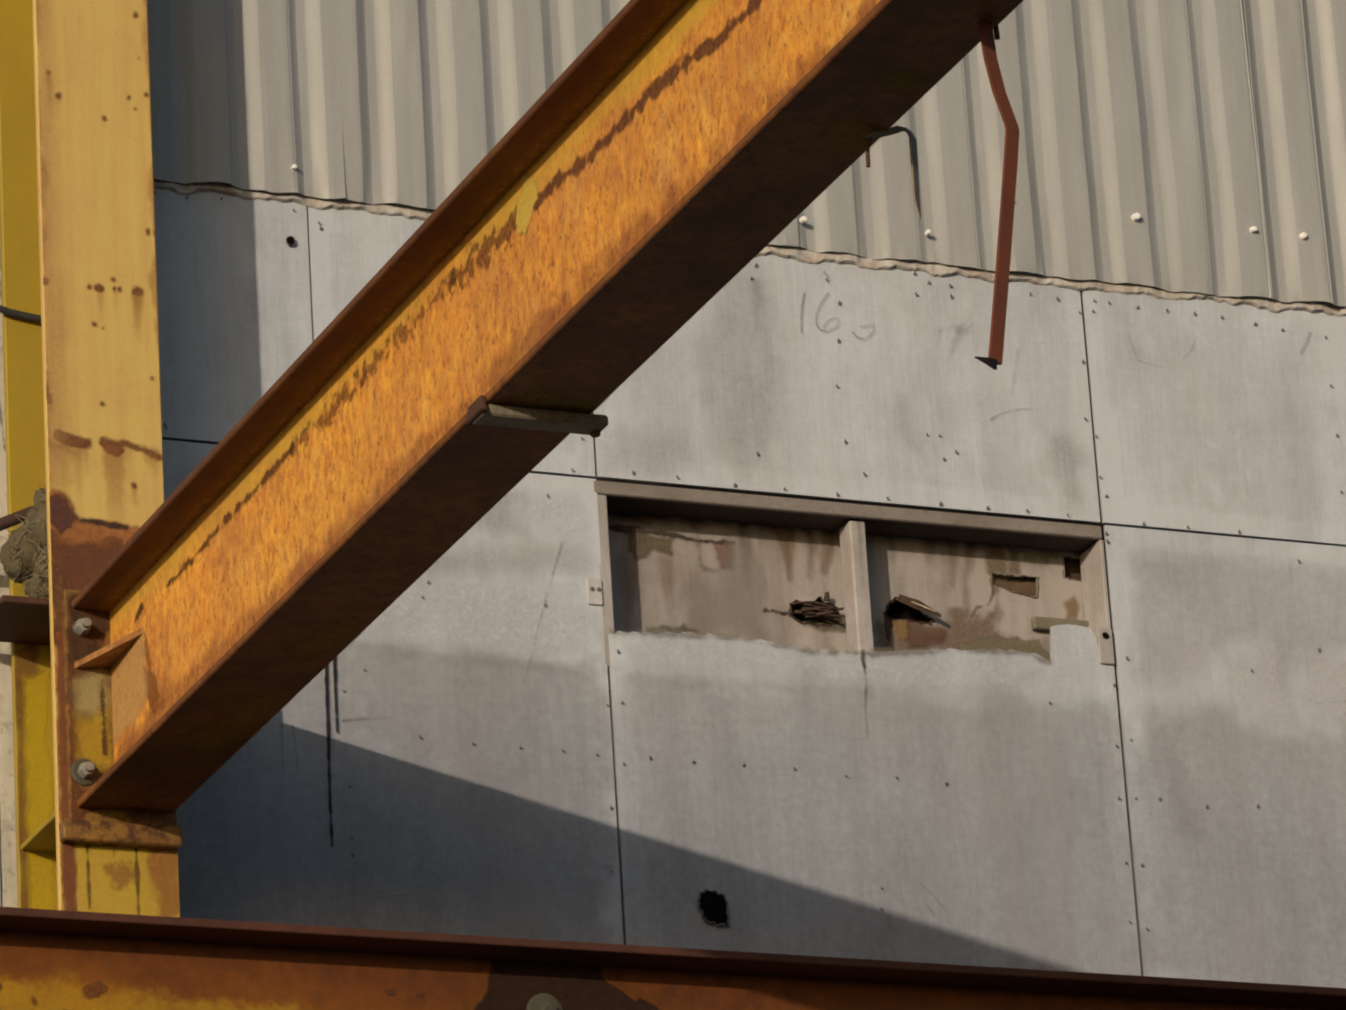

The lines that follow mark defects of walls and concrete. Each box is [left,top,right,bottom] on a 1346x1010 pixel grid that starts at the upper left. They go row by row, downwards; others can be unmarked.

corrosion [533,0,761,210]
corrosion [88,278,143,301]
corrosion [394,207,517,343]
corrosion [54,430,162,460]
corrosion [167,352,388,587]
spalling [989,572,1040,599]
spalling [1062,555,1082,581]
spalling [763,592,846,631]
spalling [883,594,945,647]
corrosion [143,638,159,713]
corrosion [83,980,107,998]
corrosion [464,960,659,1010]